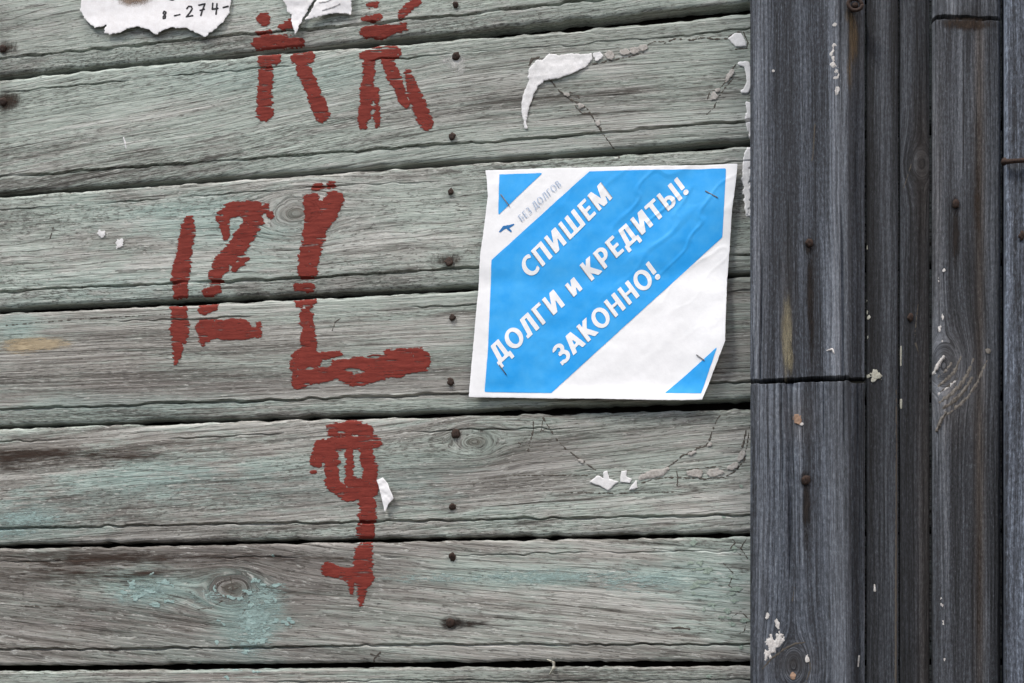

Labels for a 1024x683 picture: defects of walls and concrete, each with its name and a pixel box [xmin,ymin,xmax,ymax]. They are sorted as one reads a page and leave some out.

crack [550,80,620,158]
crack [513,415,721,494]
corrosion [441,616,487,629]